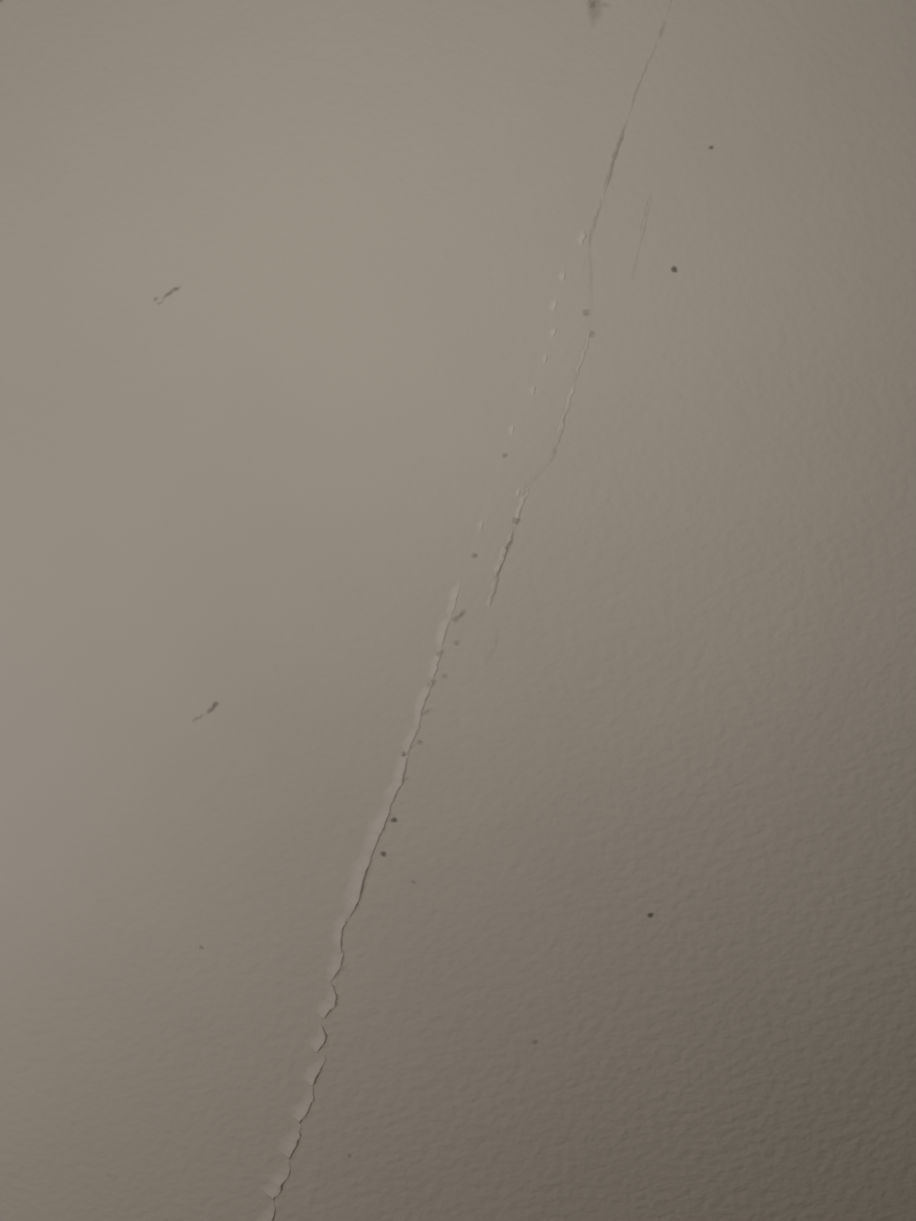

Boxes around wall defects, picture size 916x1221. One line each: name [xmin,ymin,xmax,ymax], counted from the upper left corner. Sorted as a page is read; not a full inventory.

peeling [255,578,461,1221]